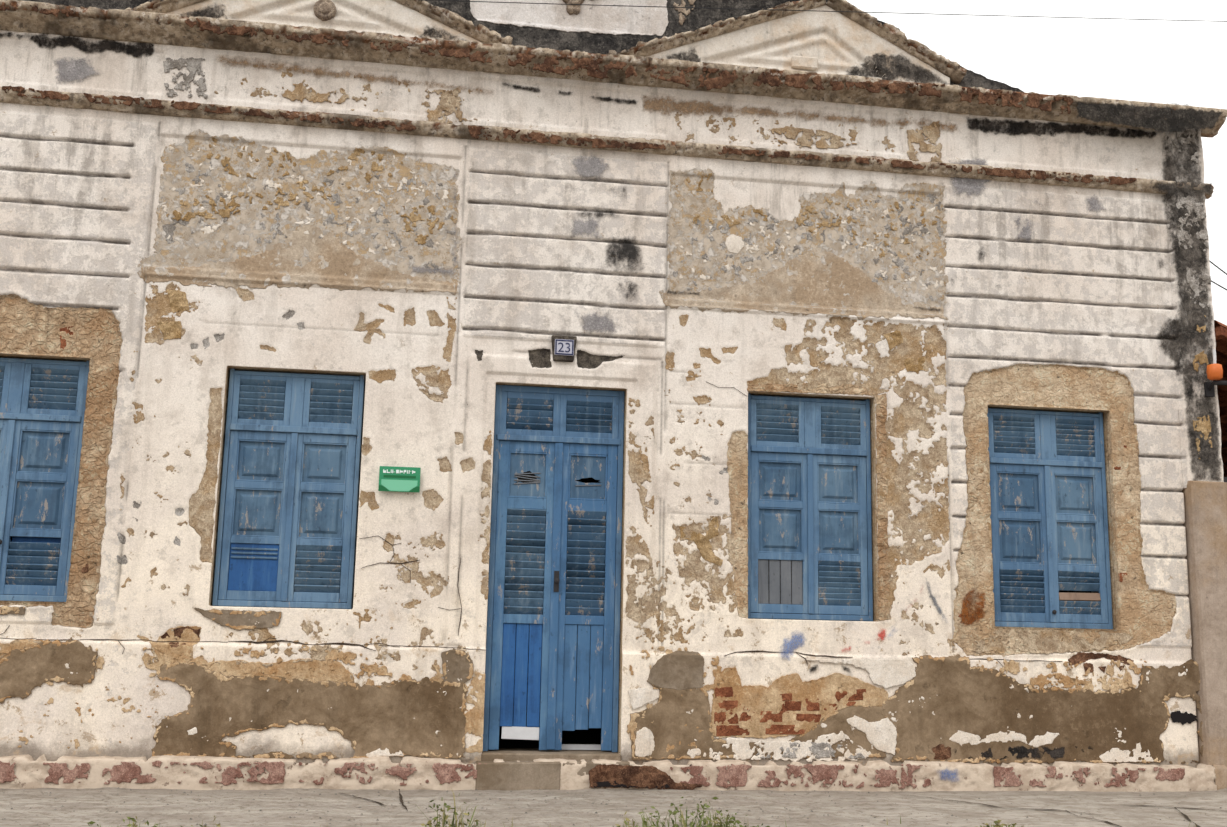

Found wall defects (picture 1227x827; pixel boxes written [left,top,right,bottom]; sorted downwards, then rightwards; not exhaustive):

peeling [2,85,174,109]
leakage [0,32,208,99]
peeling [200,64,410,127]
leakage [220,56,463,124]
peeling [421,88,568,145]
leakage [572,156,608,180]
peeling [674,112,903,167]
leakage [572,211,641,298]
leakage [592,96,1223,481]
leakage [581,313,615,332]
peeling [0,129,492,786]
peeling [625,168,1204,789]